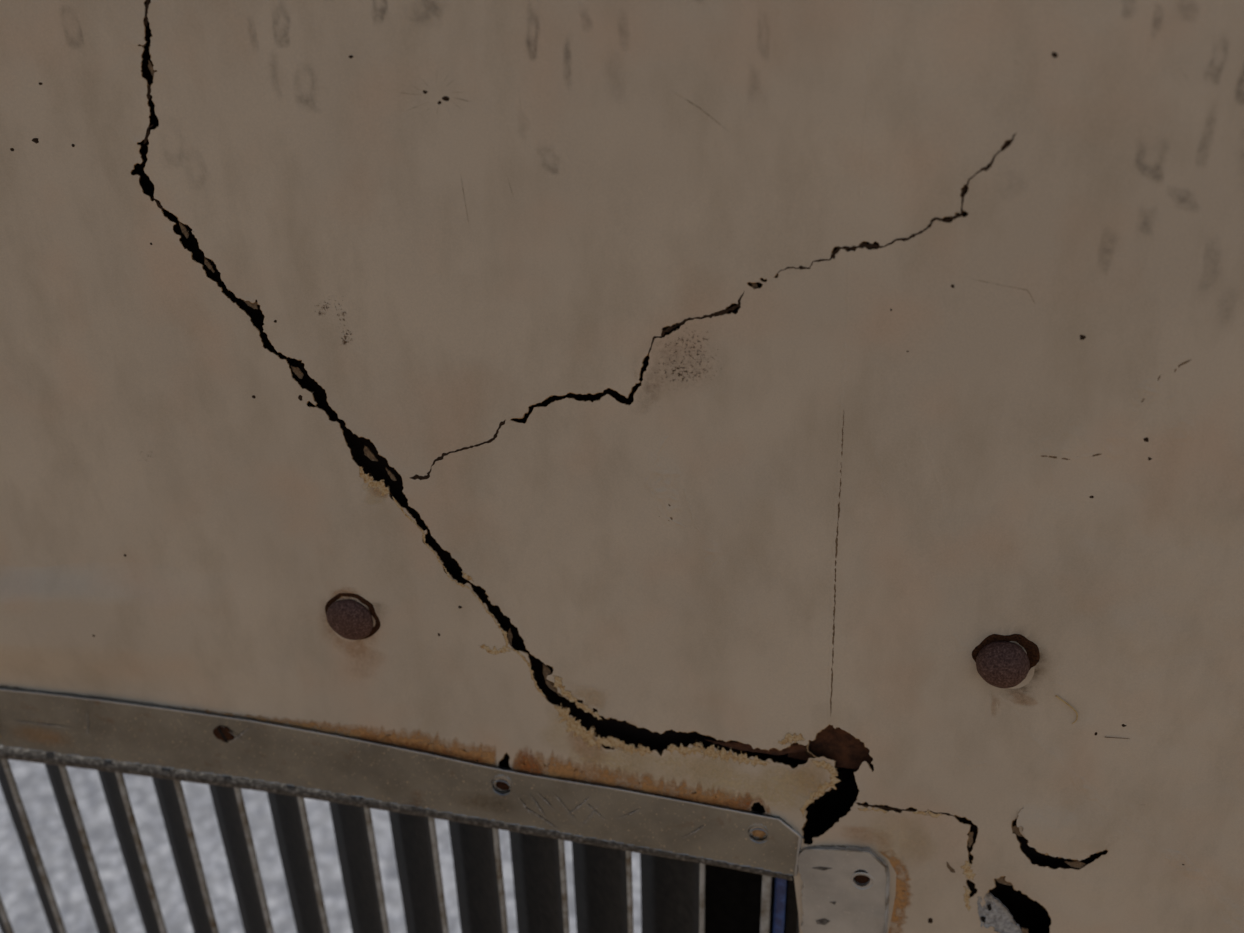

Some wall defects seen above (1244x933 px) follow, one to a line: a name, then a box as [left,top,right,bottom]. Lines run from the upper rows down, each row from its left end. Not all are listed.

crack [130,0,1016,769]
corrosion [169,706,496,765]
corrosion [514,754,751,811]
peeling [1016,789,1145,861]